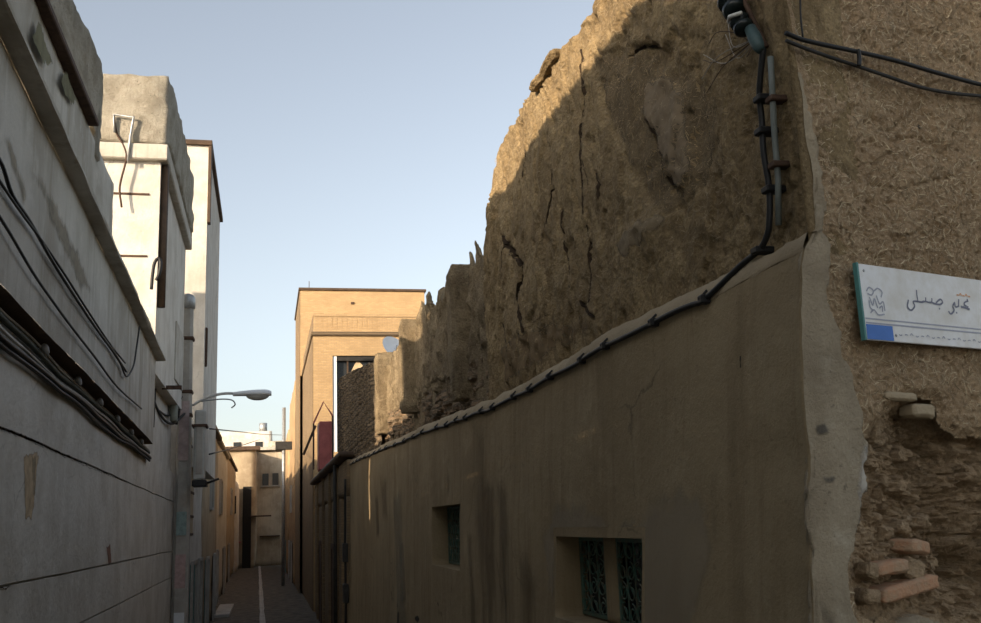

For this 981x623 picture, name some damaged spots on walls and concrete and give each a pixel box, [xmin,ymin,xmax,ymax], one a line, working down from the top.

crack [628,45,661,56]
crack [545,49,601,318]
flaking render [595,52,718,211]
crack [645,119,679,189]
crack [501,236,548,366]
spalling [848,391,981,623]